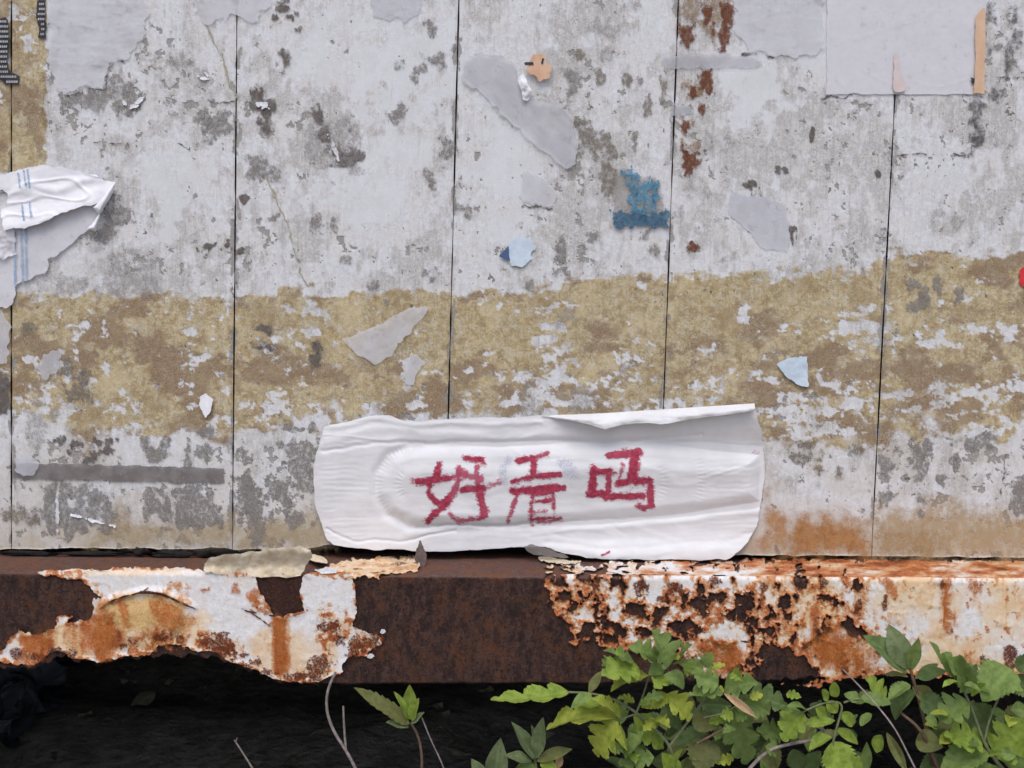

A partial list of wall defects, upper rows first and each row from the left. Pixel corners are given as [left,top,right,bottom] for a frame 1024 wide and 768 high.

rust [677,0,735,53]
rust [679,68,715,177]
peeling [552,235,570,276]
peeling [245,324,275,352]
peeling [789,440,824,475]
peeling [878,430,998,517]
peeling [1008,475,1024,517]
peeling [0,421,420,683]
rust [760,510,869,560]
rust [633,575,684,603]
rust [940,577,956,634]
rust [1003,646,1017,669]